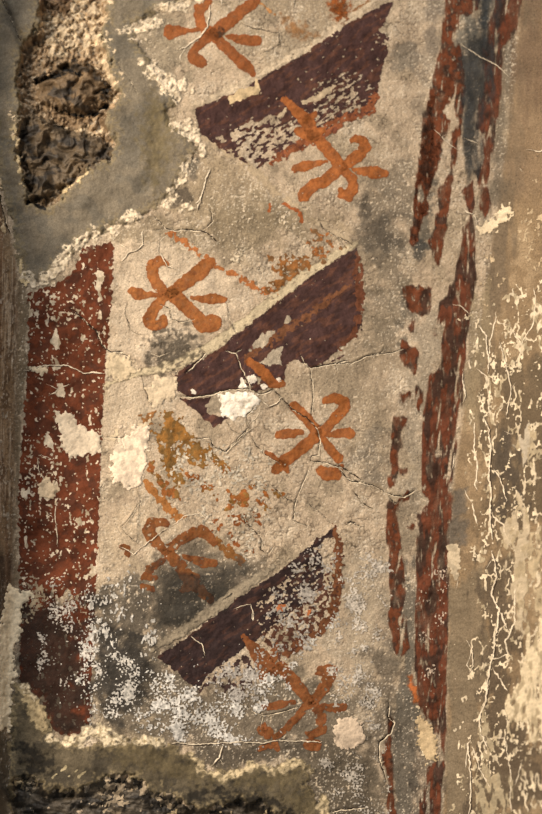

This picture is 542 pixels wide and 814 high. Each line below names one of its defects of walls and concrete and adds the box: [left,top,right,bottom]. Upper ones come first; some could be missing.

spalling [7,0,126,210]
crack [71,309,131,359]
crack [26,364,105,395]
crack [153,304,417,527]
crack [120,488,210,555]
crack [240,513,275,555]
leakage [35,538,394,756]
flaking render [7,772,274,814]